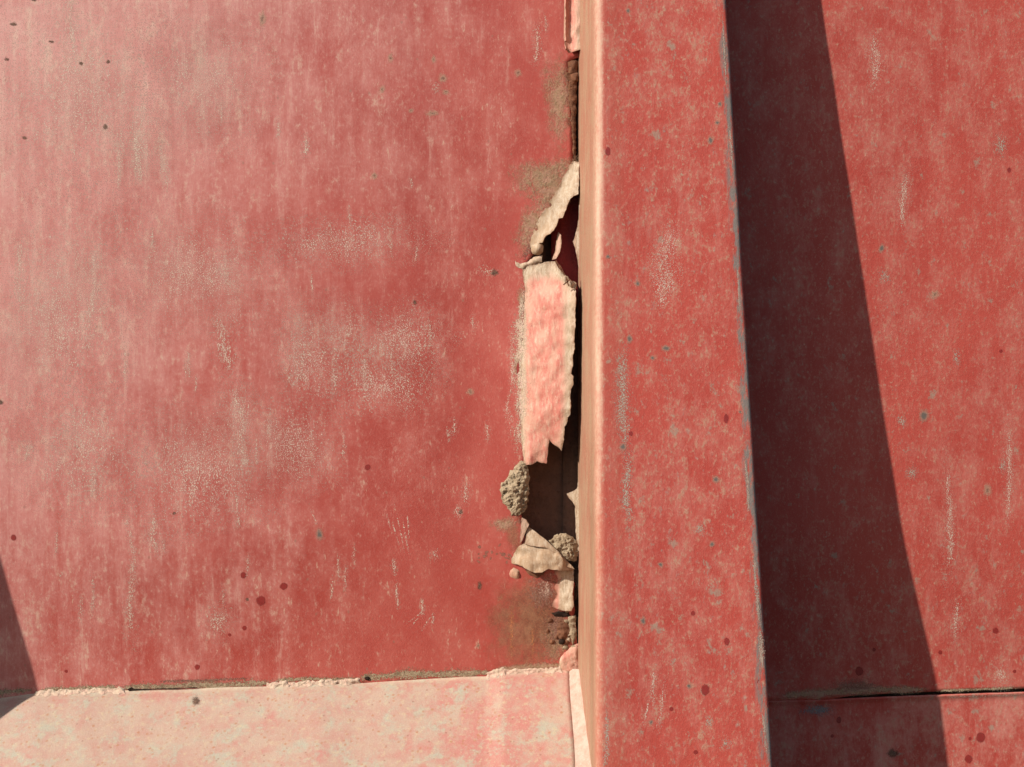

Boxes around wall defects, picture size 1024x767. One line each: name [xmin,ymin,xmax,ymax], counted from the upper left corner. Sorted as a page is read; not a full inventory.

peeling [505,261,577,465]
peeling [552,570,574,611]